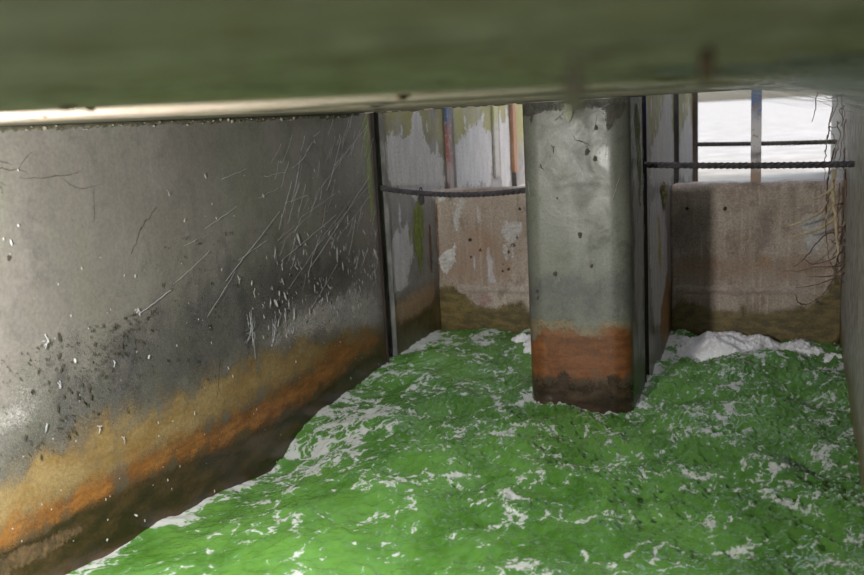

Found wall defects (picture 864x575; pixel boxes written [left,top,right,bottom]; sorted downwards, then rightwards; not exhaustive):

leakage [0,91,564,156]
crack [0,151,101,217]
leakage [528,52,864,357]
leakage [473,247,496,285]
rust [530,321,634,384]
leakage [0,218,386,575]